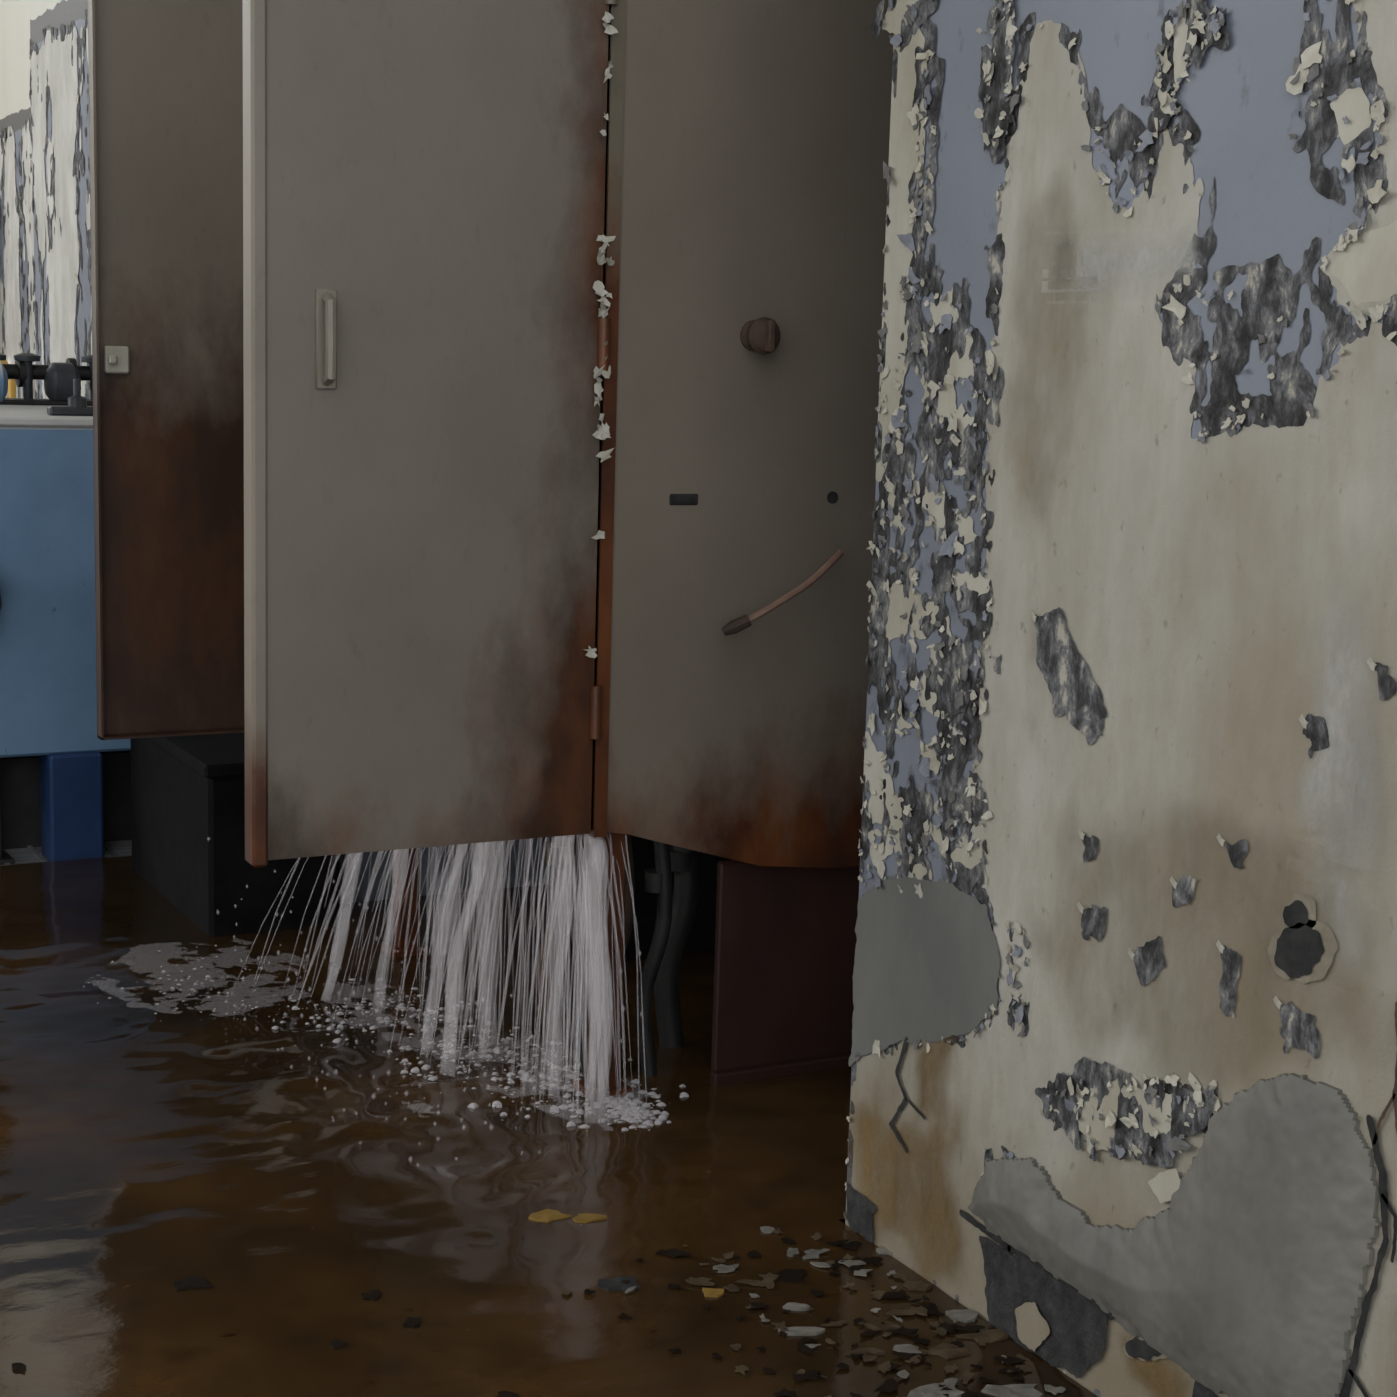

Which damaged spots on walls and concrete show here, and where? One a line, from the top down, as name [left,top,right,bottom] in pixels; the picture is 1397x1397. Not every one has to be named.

peeling [0,4,92,399]
peeling [843,0,1397,1397]
crack [889,1036,925,1153]
crack [1339,1001,1397,1397]